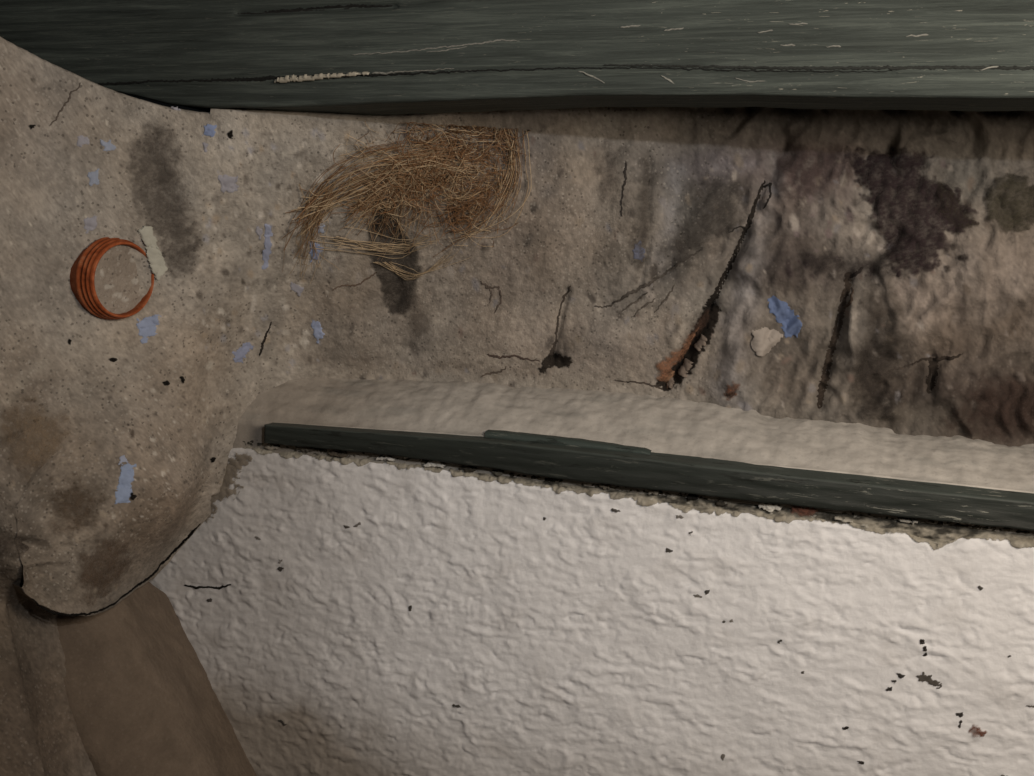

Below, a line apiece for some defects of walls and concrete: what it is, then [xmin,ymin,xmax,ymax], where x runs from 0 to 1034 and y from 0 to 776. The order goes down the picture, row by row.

crack [705,180,772,306]
leakage [778,147,1034,277]
crack [481,286,573,377]
rust [656,311,710,381]
crack [817,268,862,409]
flaking render [205,440,1034,550]
crack [31,523,201,617]